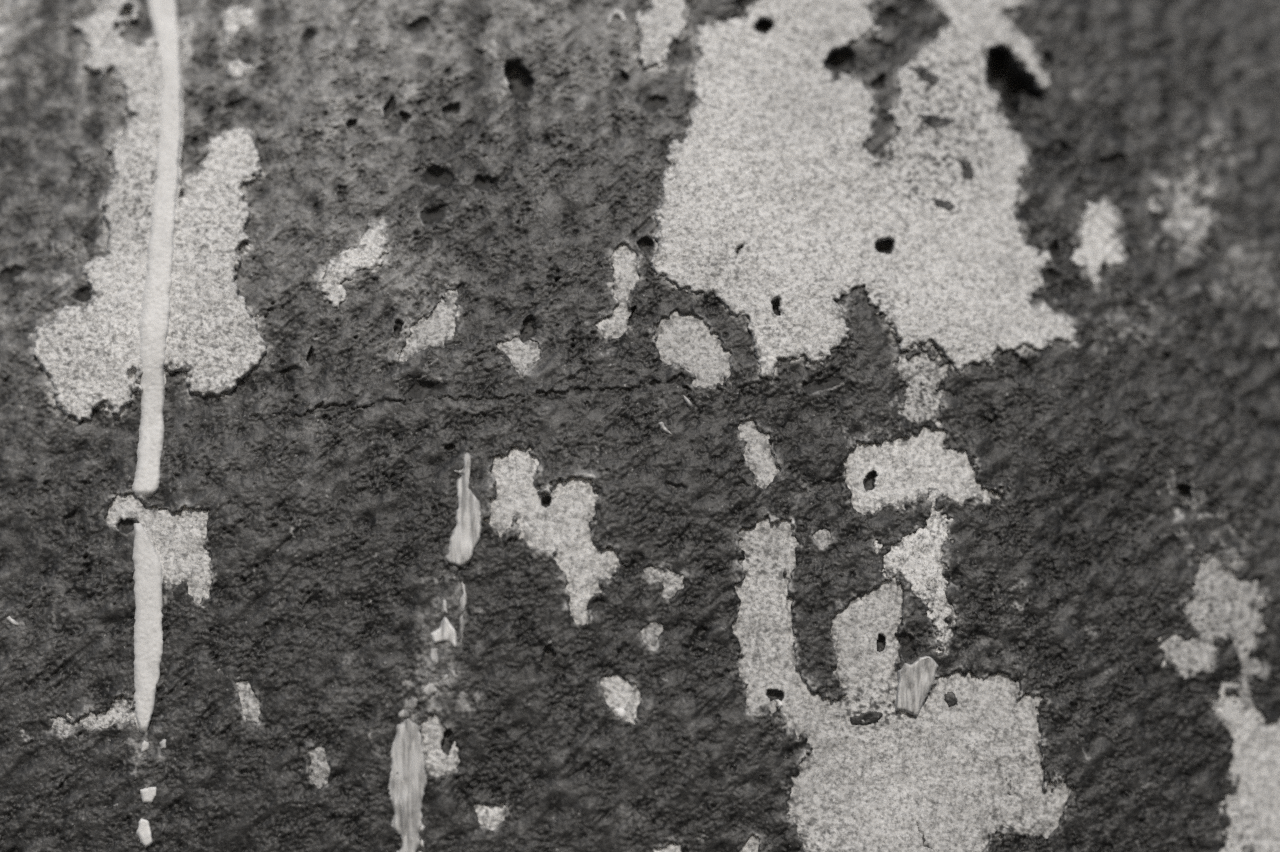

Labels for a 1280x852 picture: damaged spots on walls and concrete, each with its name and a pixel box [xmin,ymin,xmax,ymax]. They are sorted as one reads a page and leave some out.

peeling [180,18,194,63]
peeling [222,7,255,41]
peeling [224,59,254,80]
peeling [30,0,164,422]
peeling [164,127,268,397]
peeling [105,493,214,604]
peeling [388,444,625,852]
peeling [595,0,1126,852]
peeling [1158,552,1280,852]